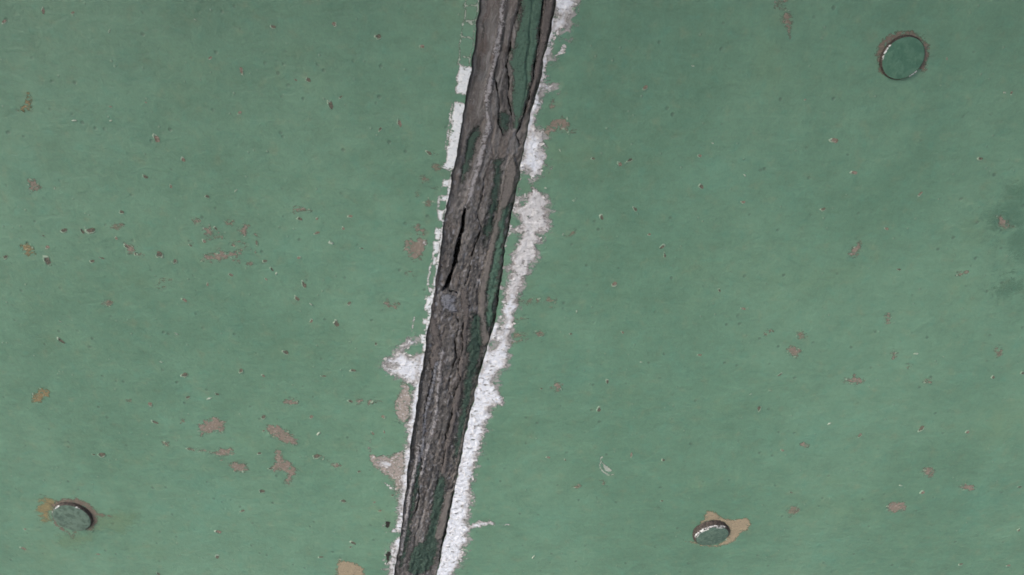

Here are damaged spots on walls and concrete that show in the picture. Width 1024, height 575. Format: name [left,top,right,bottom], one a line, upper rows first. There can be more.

crack [494,0,544,144]
peeling [368,0,479,575]
peeling [437,0,581,575]
crack [412,179,484,562]
peeling [257,415,298,485]
peeling [335,559,365,575]
spalling [683,511,751,547]